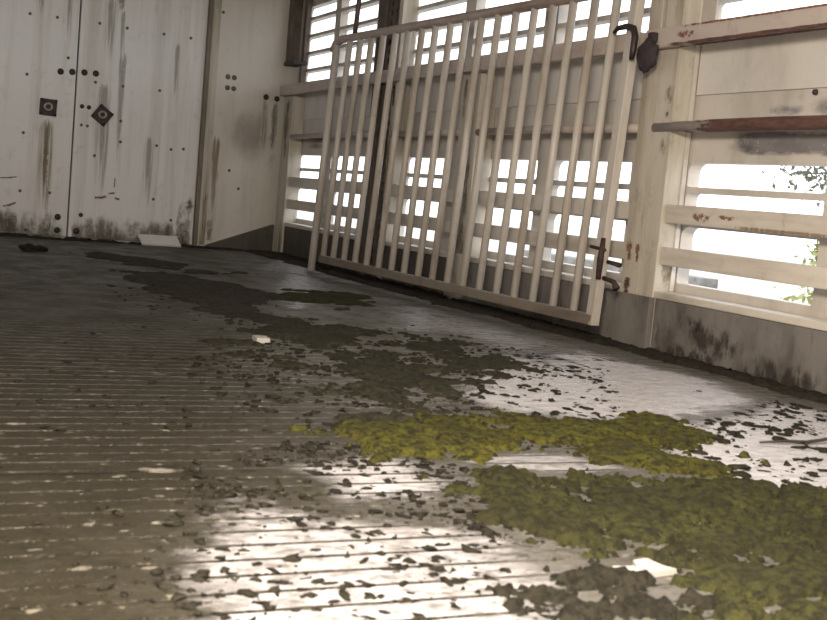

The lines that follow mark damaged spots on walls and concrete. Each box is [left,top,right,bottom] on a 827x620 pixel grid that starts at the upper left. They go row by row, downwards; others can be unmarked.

corrosion [671,4,827,47]
corrosion [684,115,827,133]
corrosion [626,241,640,262]